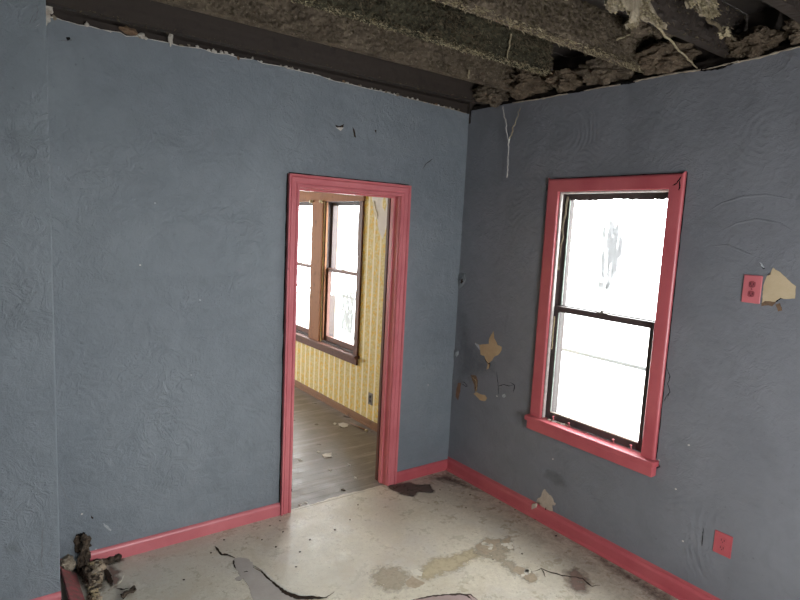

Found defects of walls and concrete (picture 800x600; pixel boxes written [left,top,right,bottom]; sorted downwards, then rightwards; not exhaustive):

flaking render [46,6,464,113]
flaking render [584,46,800,91]
peeling [759,262,796,311]
peeling [475,331,502,370]
peeling [531,489,556,511]